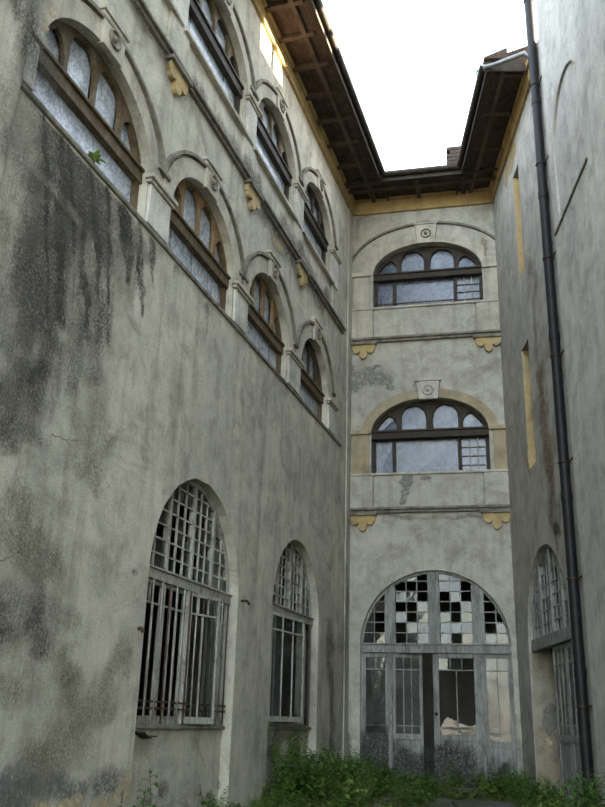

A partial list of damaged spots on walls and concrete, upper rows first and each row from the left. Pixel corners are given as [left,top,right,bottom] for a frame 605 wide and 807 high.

leakage [12,0,59,93]
leakage [82,0,336,397]
leakage [324,187,339,251]
leakage [0,113,156,452]
flaking render [351,365,394,392]
leakage [0,588,55,657]
leakage [0,682,125,807]